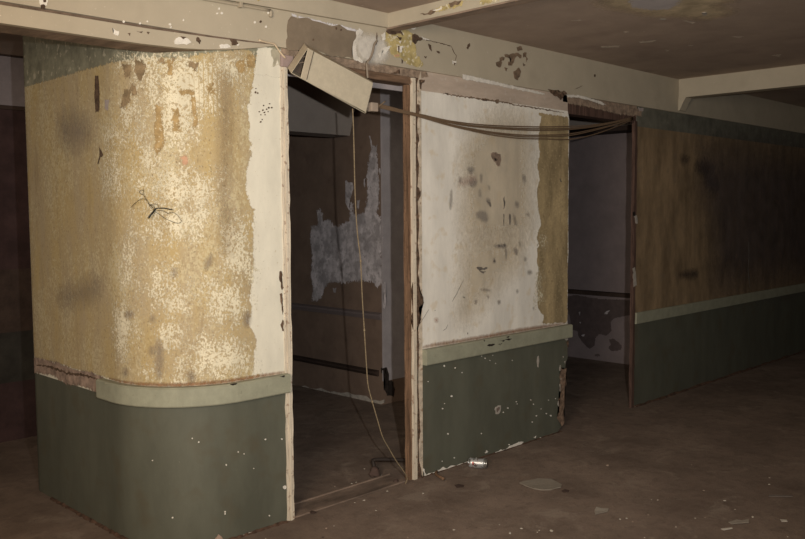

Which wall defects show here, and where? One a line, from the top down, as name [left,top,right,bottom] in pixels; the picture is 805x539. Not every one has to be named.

peeling [421,0,463,15]
water stain [602,0,729,20]
peeling [496,46,528,80]
peeling [25,16,440,392]
peeling [533,113,630,357]
spalling [532,356,567,426]